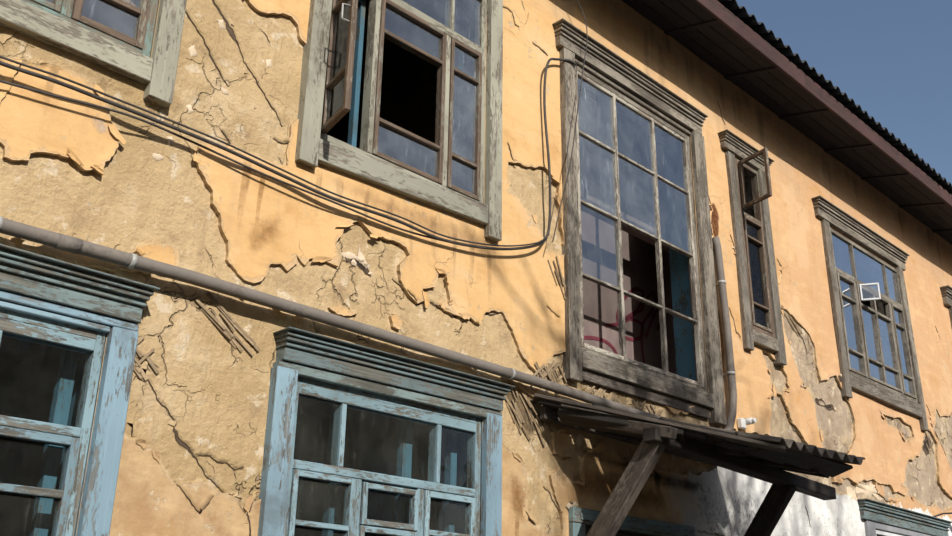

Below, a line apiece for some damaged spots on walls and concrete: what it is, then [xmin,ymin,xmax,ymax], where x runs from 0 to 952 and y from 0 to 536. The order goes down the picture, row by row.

crack [185,0,290,164]
flaking render [0,0,736,536]
crack [127,418,139,437]
crack [133,343,260,536]
flaking render [753,307,857,455]
flaking render [788,409,952,512]